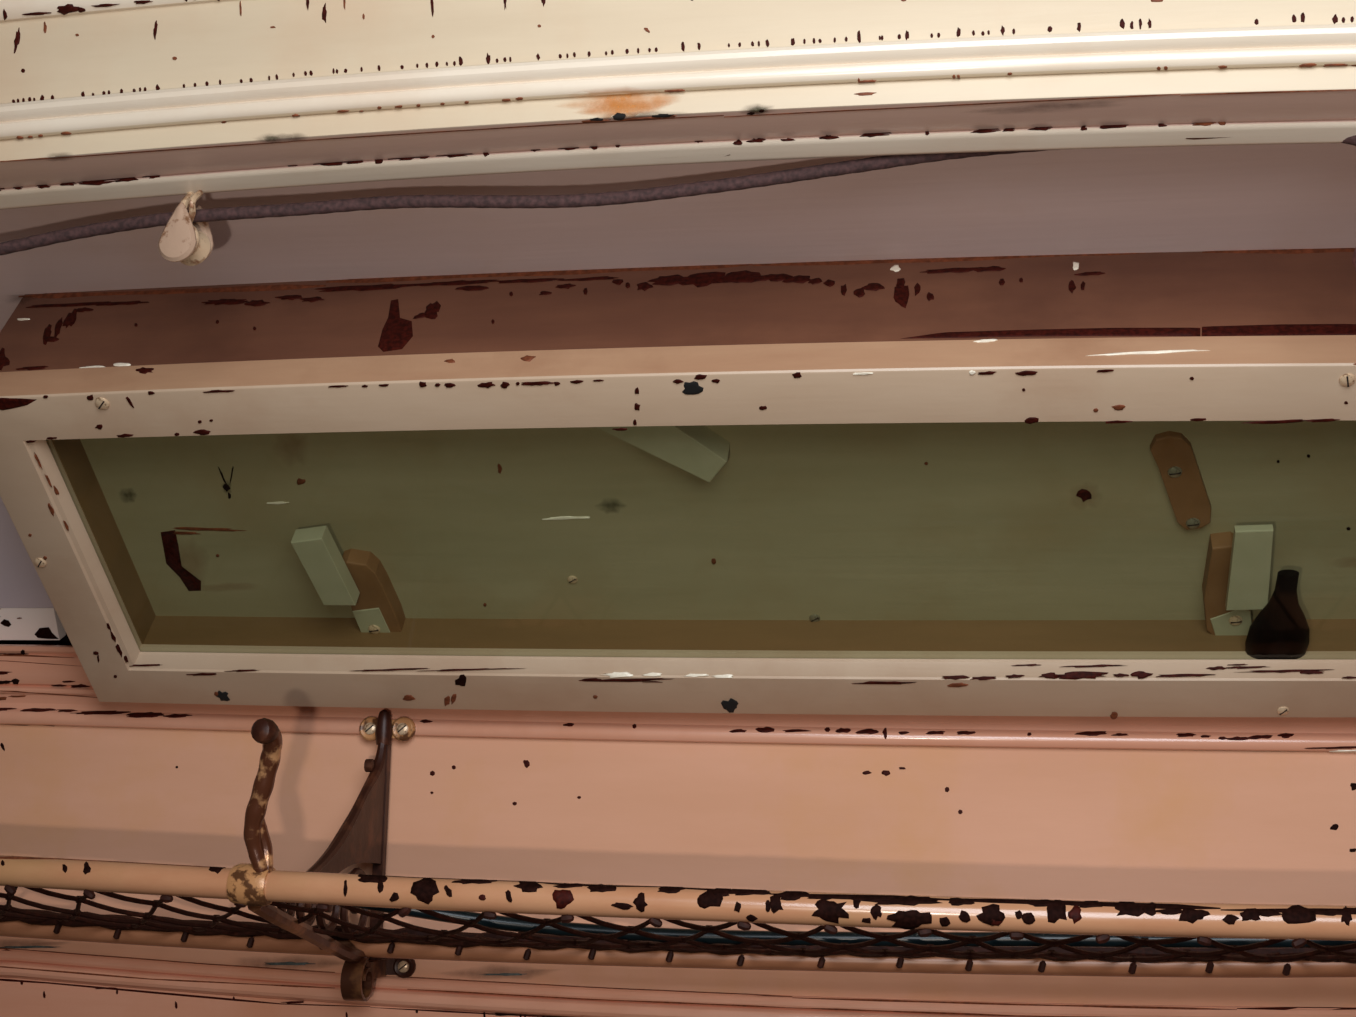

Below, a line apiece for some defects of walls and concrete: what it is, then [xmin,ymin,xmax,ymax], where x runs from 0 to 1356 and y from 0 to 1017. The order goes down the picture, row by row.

peeling [3,4,118,21]
spalling [791,30,861,46]
spalling [956,26,1015,37]
spalling [1120,18,1151,29]
spalling [559,47,658,59]
spalling [81,84,160,97]
rust [581,94,676,123]
peeling [34,627,58,639]
spalling [0,671,193,726]
spalling [729,727,910,739]
peeling [0,856,226,874]
peeling [343,874,1356,930]